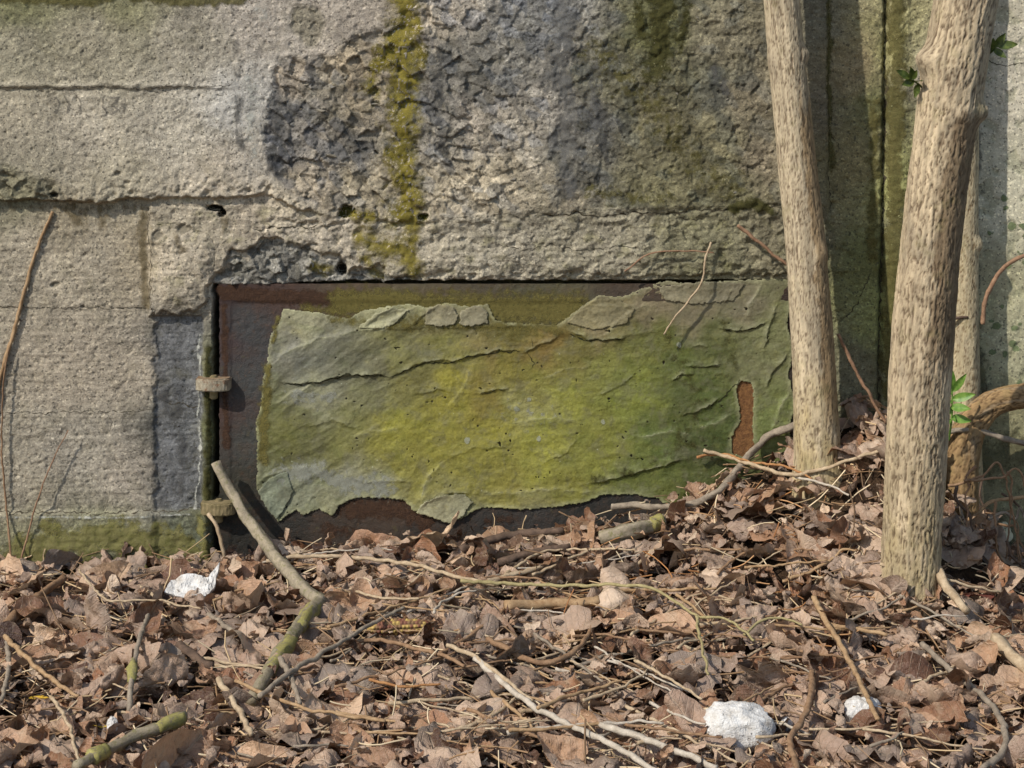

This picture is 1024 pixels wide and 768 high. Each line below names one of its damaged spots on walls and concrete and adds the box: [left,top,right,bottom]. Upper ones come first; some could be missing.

water stain [367,34,398,103]
rust [215,283,335,377]
peeling [256,278,793,523]
rust [728,381,754,457]